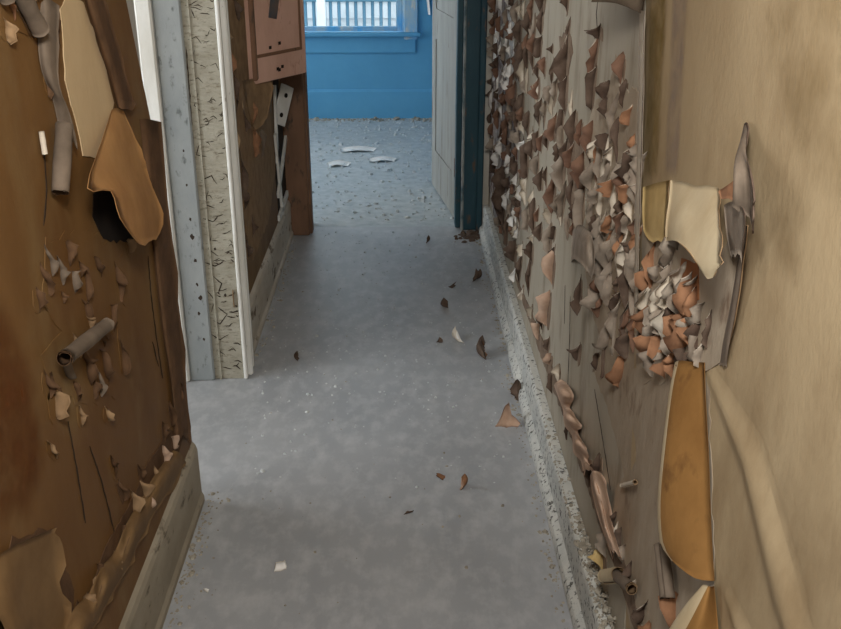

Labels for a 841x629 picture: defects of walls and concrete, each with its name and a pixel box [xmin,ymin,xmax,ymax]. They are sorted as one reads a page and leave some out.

peeling [3,17,19,45]
peeling [231,51,240,108]
peeling [237,132,250,209]
spalling [273,79,289,221]
spalling [92,190,137,253]
peeling [39,240,105,328]
peeling [485,0,739,629]
peeling [44,335,116,427]
peeling [162,435,180,462]
peeling [130,465,159,513]